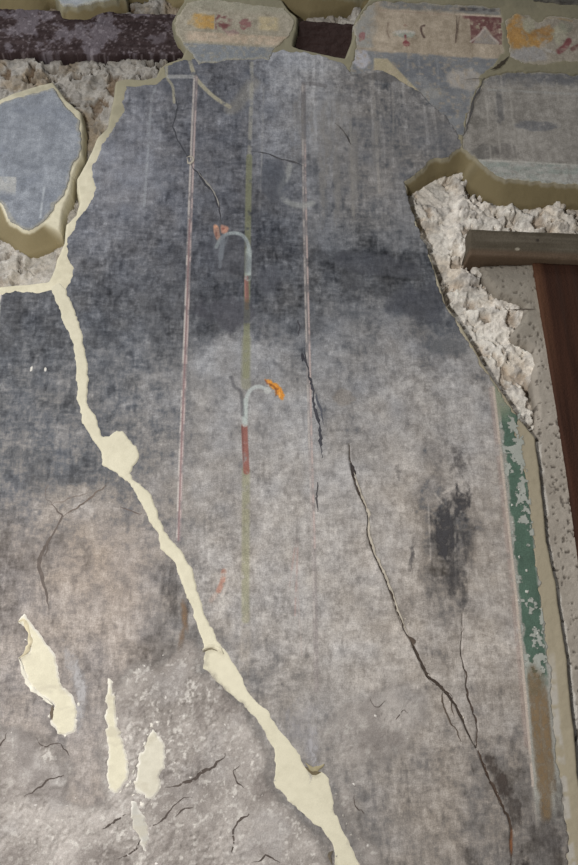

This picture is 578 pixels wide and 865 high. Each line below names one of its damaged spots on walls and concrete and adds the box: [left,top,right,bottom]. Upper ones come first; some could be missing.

crack [172,94,221,220]
crack [37,283,362,865]
crack [349,446,512,865]
water stain [430,484,470,590]
peeling [499,410,534,558]
peeling [516,569,547,681]
spalling [0,614,331,865]
spalling [338,783,379,865]